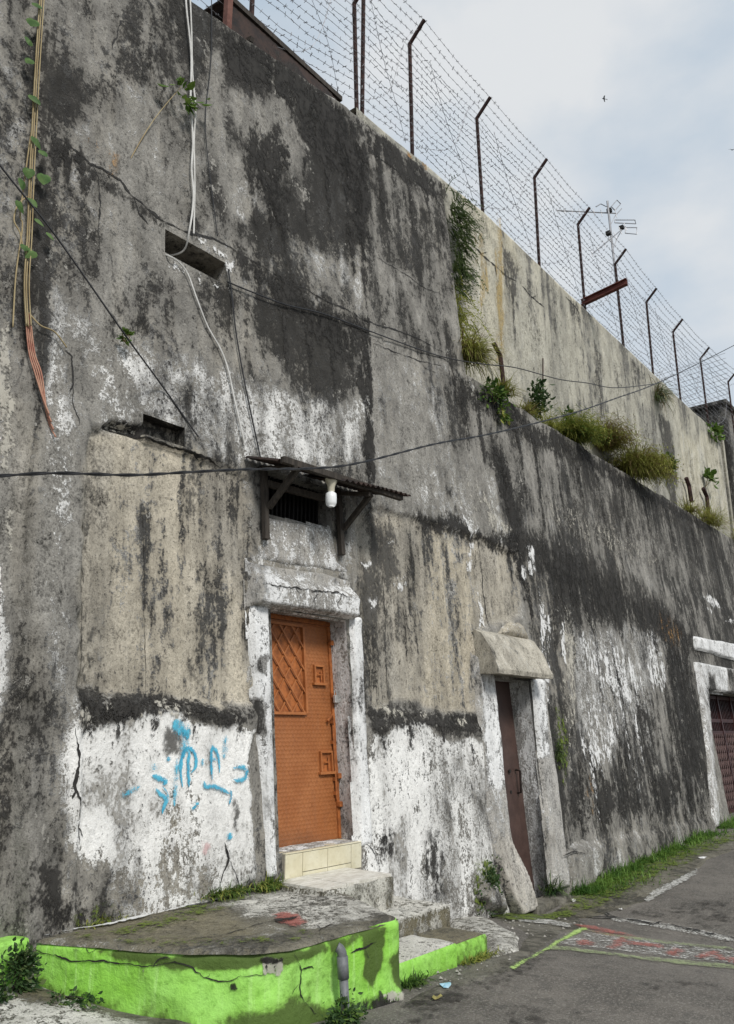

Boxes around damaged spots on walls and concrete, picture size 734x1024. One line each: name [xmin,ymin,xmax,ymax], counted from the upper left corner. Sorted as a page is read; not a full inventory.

crack [54,136,443,372]
leakage [217,25,447,485]
leakage [78,589,255,739]
crack [253,578,354,610]
leakage [359,500,483,760]
leakage [407,300,734,843]
crack [72,728,83,844]
crack [35,919,275,982]
spalling [261,957,283,976]
crack [292,958,316,1014]